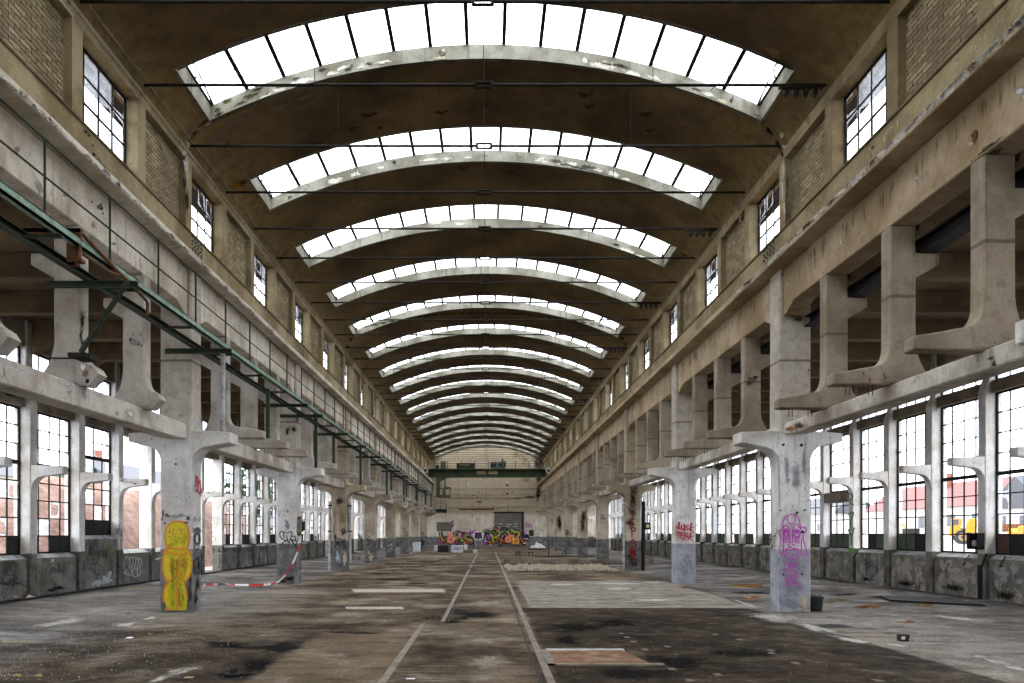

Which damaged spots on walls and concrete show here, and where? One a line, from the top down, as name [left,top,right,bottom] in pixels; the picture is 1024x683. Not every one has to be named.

peeling [327,60,392,76]
peeling [582,57,661,82]
peeling [261,77,314,98]
peeling [535,157,630,181]